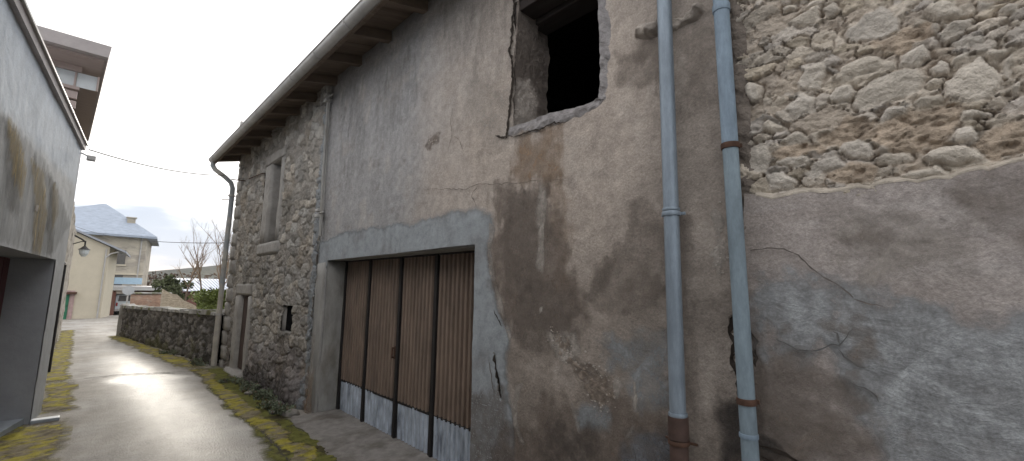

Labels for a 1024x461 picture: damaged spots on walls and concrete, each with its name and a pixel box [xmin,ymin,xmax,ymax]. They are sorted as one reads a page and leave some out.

crack [497,0,567,139]
water stain [493,185,588,350]
crack [750,247,887,308]
crack [489,355,501,397]
spalling [728,315,738,401]
spalling [751,332,759,367]
crack [774,329,879,402]